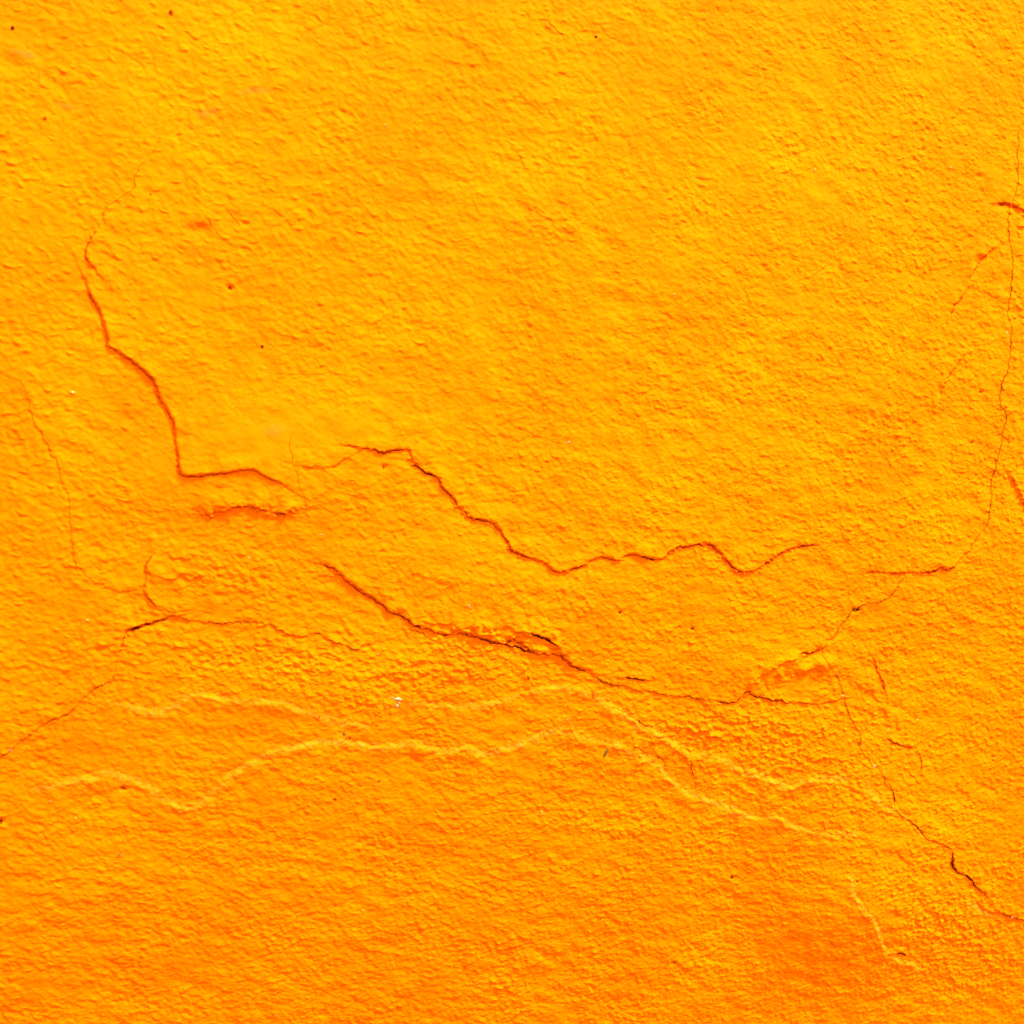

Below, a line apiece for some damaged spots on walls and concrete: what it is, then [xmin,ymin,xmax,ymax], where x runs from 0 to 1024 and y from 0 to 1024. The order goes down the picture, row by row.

crack [0,130,1024,920]